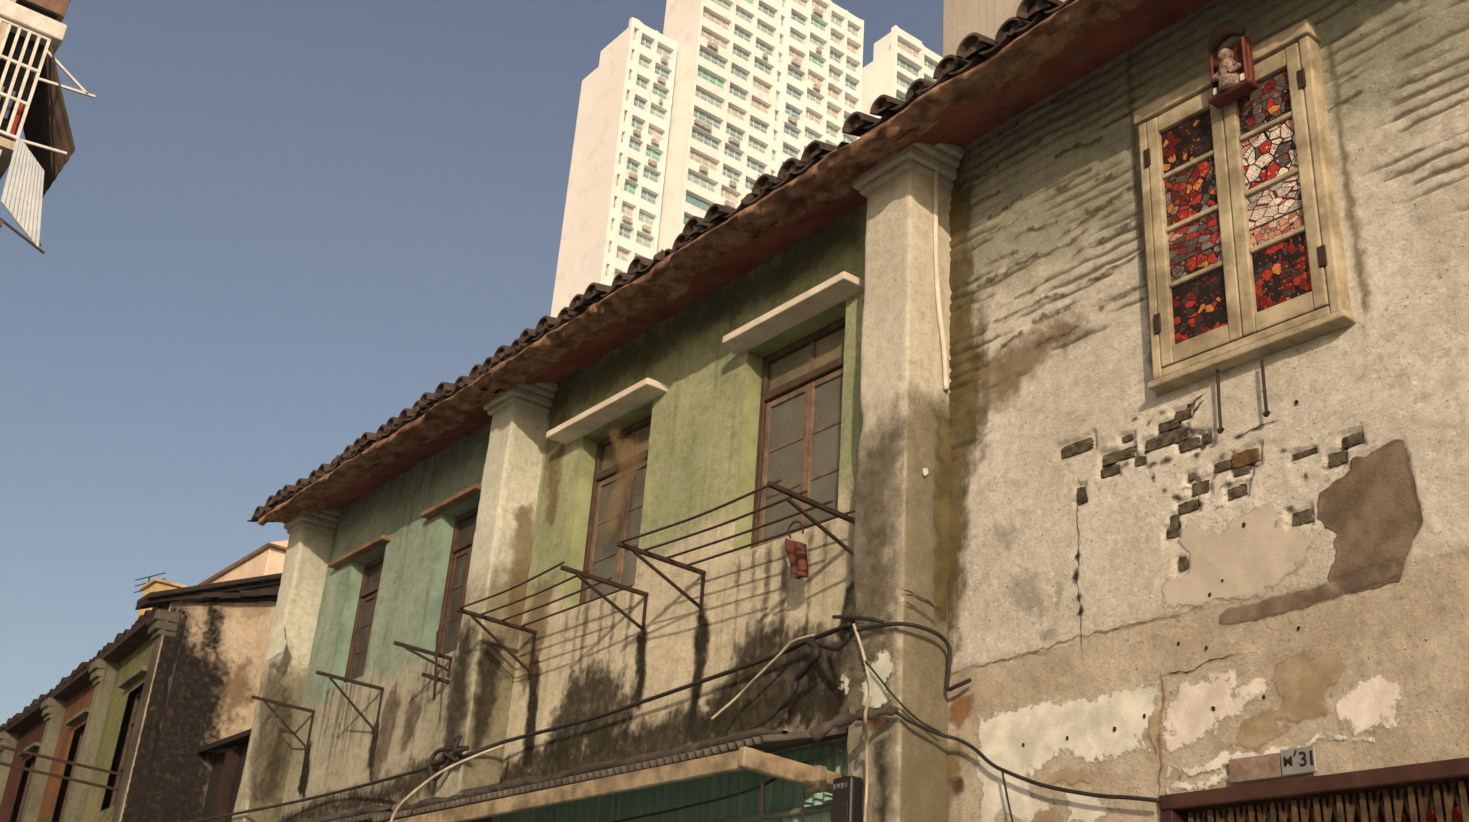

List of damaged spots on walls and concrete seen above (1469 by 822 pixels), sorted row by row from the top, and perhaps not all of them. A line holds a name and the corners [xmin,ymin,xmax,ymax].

leakage [121,597,284,822]
leakage [278,399,907,822]
peeling [839,650,893,708]
crack [950,478,1220,675]
peeling [975,651,1405,822]
spalling [1061,408,1423,609]